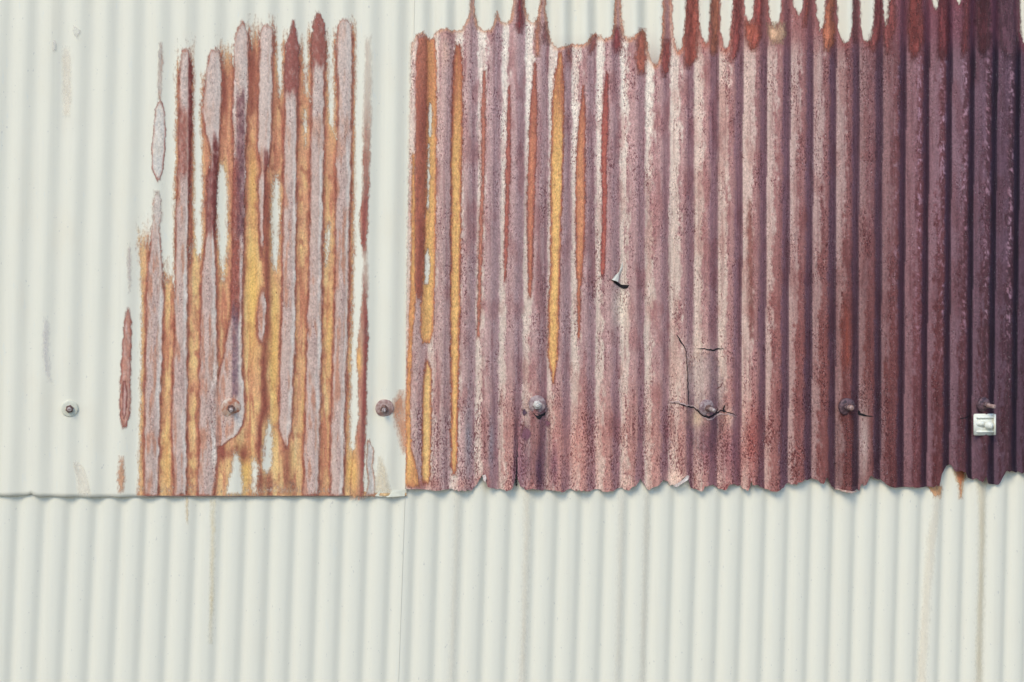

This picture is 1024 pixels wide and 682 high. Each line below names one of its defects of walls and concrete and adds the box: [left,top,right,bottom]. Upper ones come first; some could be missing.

corrosion [119,13,390,520]
crack [671,335,737,420]
corrosion [394,0,1024,496]